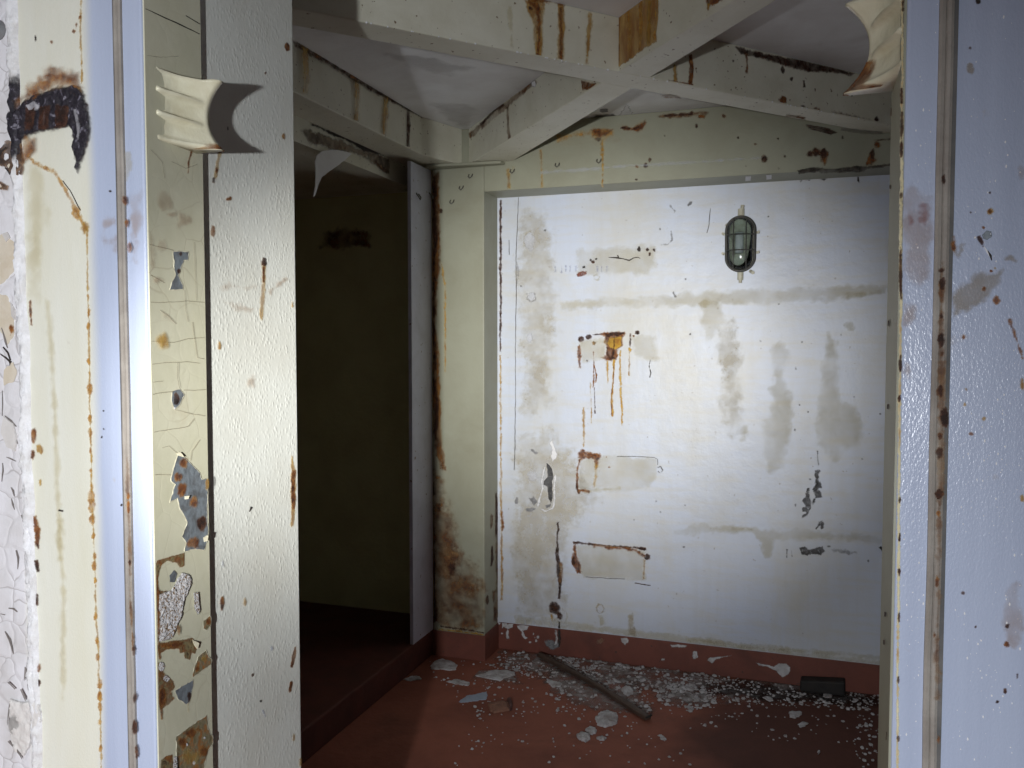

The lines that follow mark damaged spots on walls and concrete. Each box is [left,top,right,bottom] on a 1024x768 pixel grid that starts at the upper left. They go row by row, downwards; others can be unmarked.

rust [618,0,658,66]
rust [23,13,88,233]
peeling [169,250,189,291]
crack [0,347,17,385]
rust [936,268,948,458]
rust [432,173,504,635]
rust [576,331,639,494]
spalling [515,441,557,512]
peeling [156,452,212,709]
rust [572,541,650,579]
crack [2,608,17,653]
peeling [161,715,214,768]